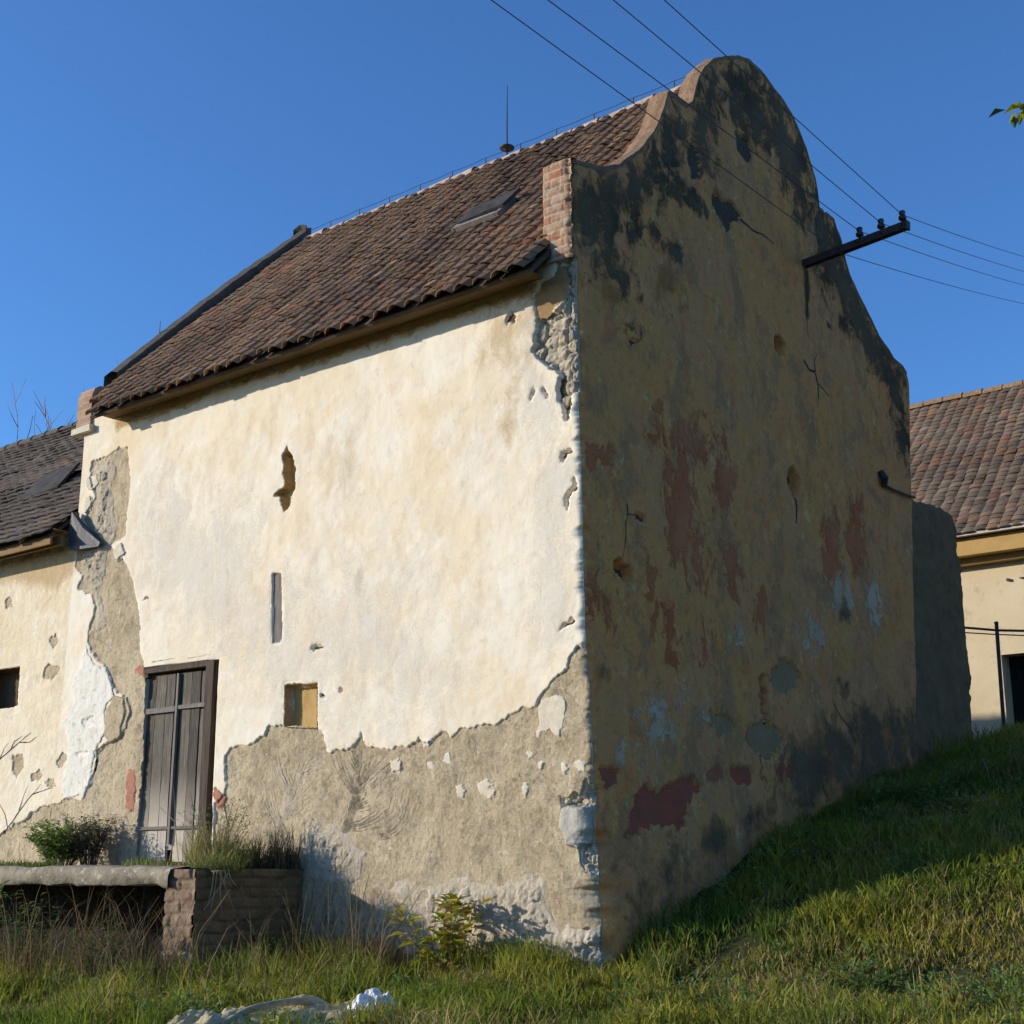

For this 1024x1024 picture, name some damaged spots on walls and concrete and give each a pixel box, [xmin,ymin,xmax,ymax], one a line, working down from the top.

water stain [636,219,683,265]
water stain [663,158,709,221]
spalling [534,257,580,420]
crack [804,325,829,408]
flaking render [0,447,149,866]
flaking render [212,397,800,975]
water stain [785,704,917,817]